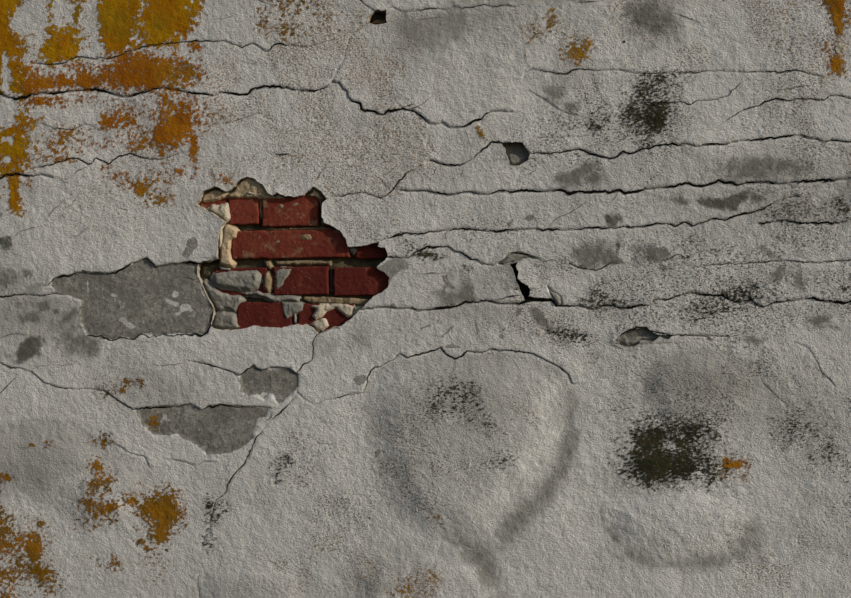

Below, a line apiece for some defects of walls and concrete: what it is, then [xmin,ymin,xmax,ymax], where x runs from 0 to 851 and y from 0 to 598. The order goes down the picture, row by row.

hole [367,9,387,25]
rust [808,0,851,80]
crack [0,0,851,274]
spalling [502,142,530,166]
flaking render [52,177,408,340]
crack [361,292,851,350]
spalling [616,327,672,348]
flaking render [136,366,298,455]